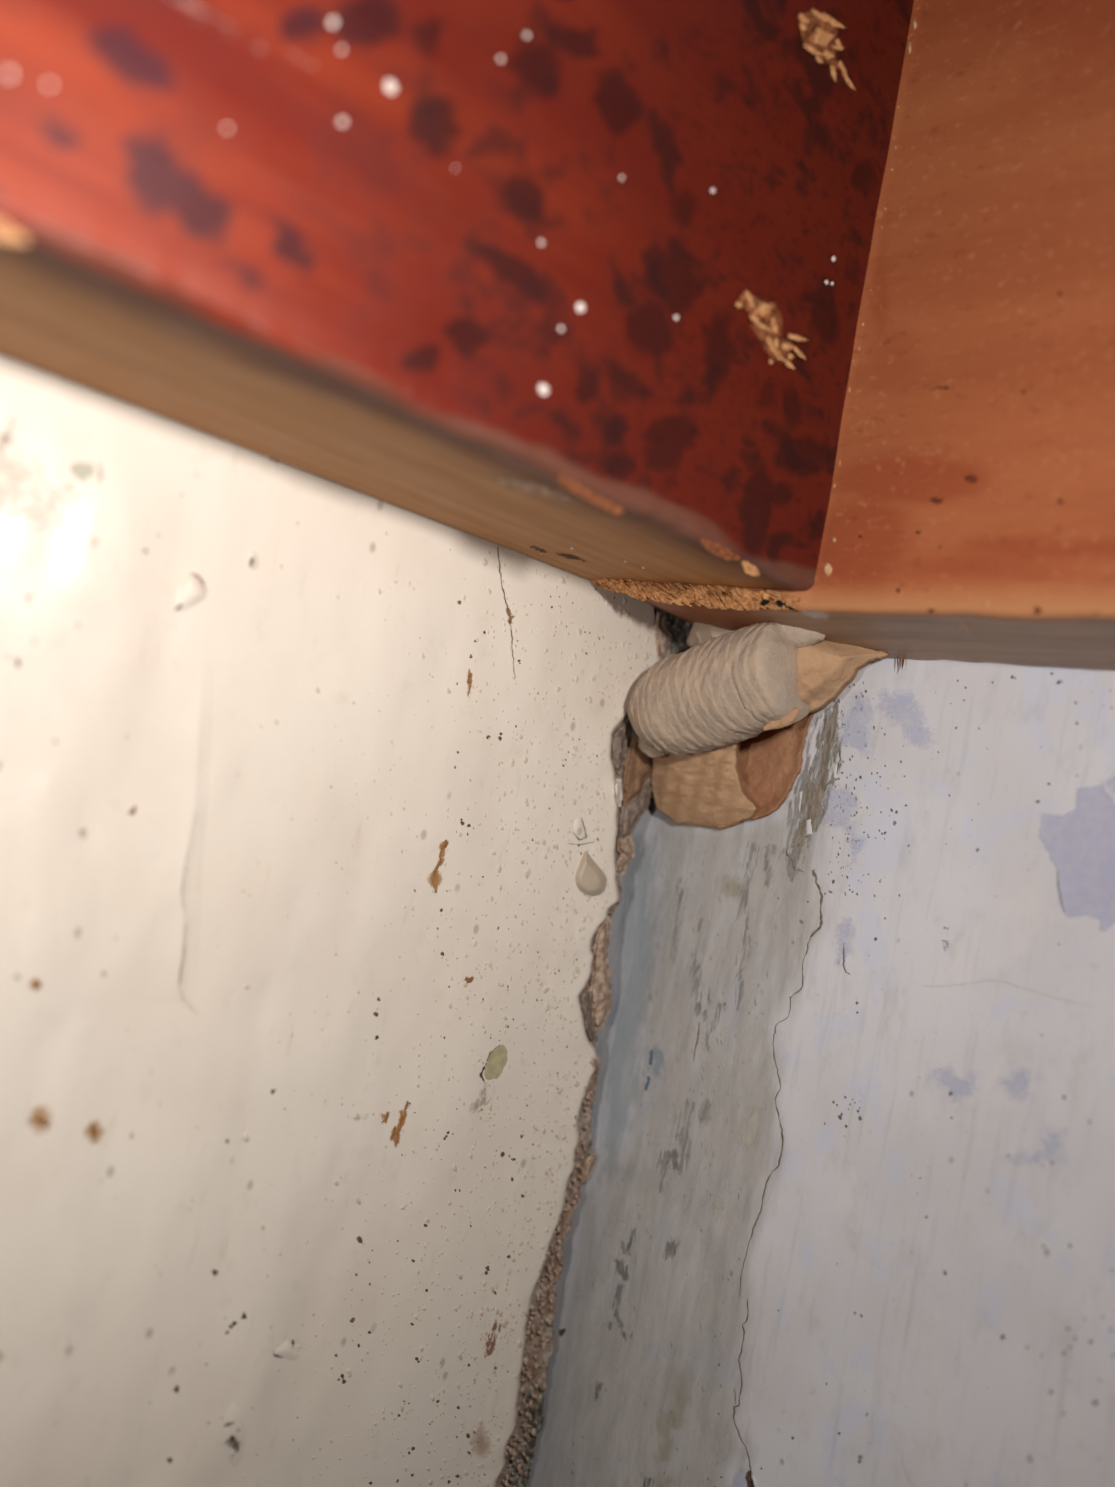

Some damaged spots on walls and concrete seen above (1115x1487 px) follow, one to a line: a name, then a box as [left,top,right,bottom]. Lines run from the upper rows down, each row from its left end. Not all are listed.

rust [429,840,449,893]
peeling [1040,786,1115,930]
crack [733,869,850,1469]